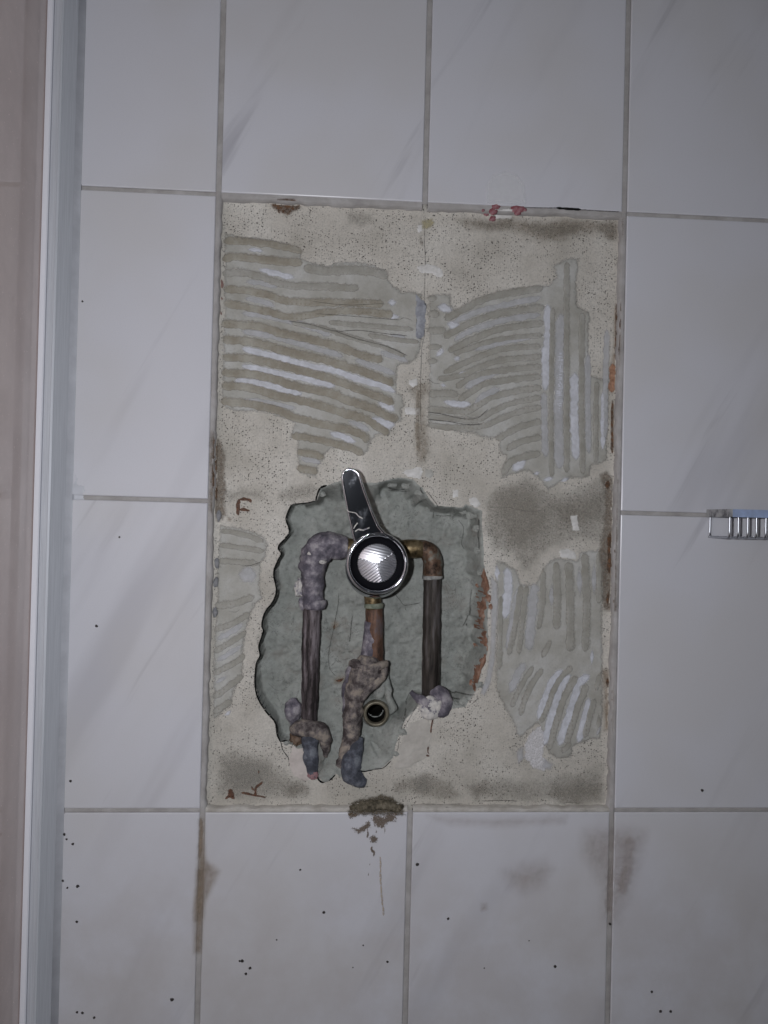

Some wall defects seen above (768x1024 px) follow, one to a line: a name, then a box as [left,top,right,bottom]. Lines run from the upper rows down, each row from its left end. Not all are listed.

corrosion [272,199,299,214]
spalling [256,481,353,753]
spalling [317,558,366,782]
spalling [360,558,424,771]
spalling [363,478,493,709]